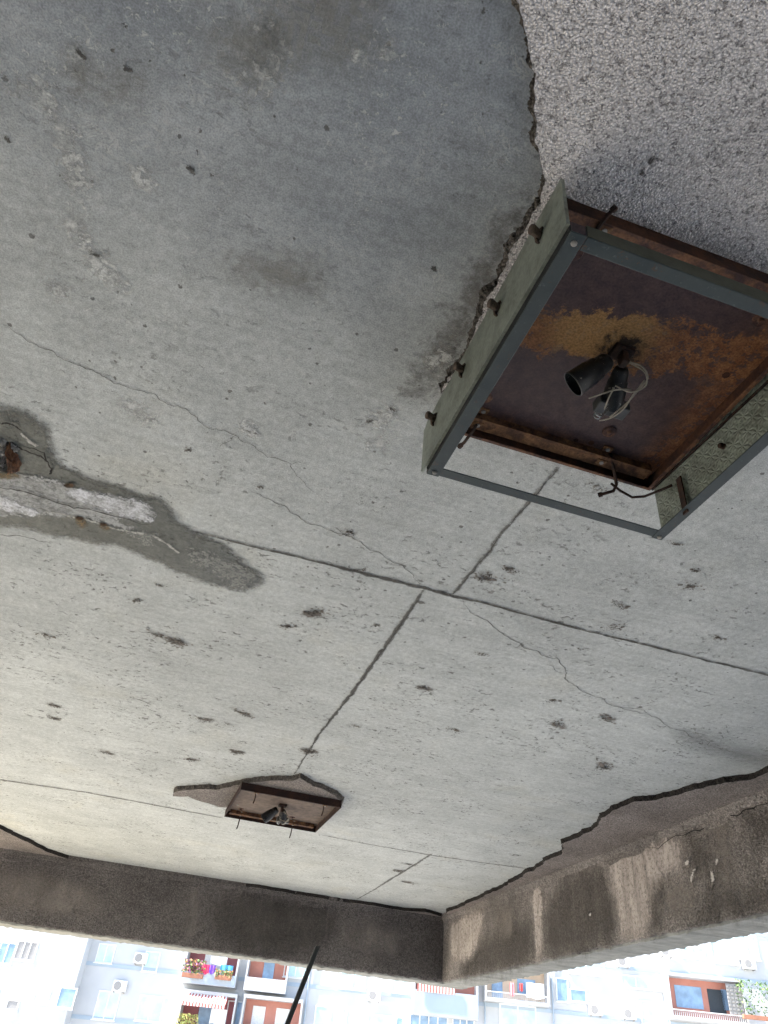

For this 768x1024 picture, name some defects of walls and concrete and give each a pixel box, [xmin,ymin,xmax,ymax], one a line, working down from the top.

spalling [438,0,545,393]
spalling [0,438,22,475]
crack [2,422,140,524]
damp [0,407,261,592]
crack [1,323,323,500]
crack [251,491,421,586]
crack [463,601,760,759]
spalling [0,825,69,858]
spalling [173,773,345,804]
spalling [240,766,768,916]
damp [450,837,713,975]